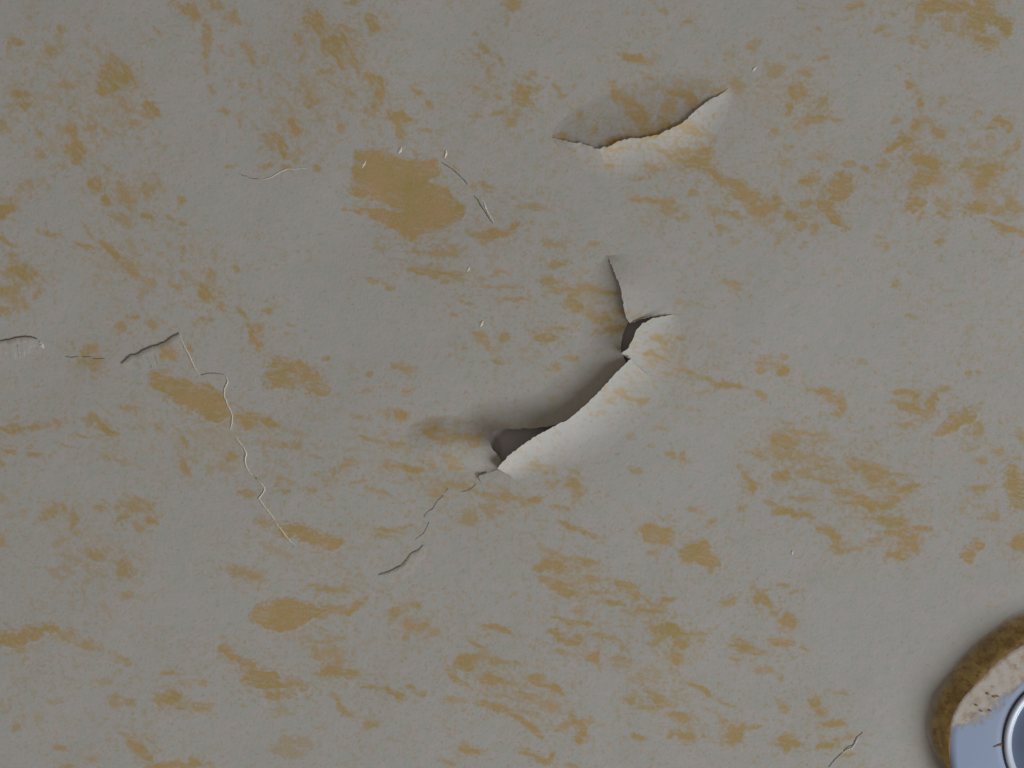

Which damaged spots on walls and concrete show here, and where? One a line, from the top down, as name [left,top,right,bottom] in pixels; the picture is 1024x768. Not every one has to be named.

peeling [552,73,732,178]
crack [0,333,296,546]
crack [378,484,476,583]
peeling [451,254,684,482]